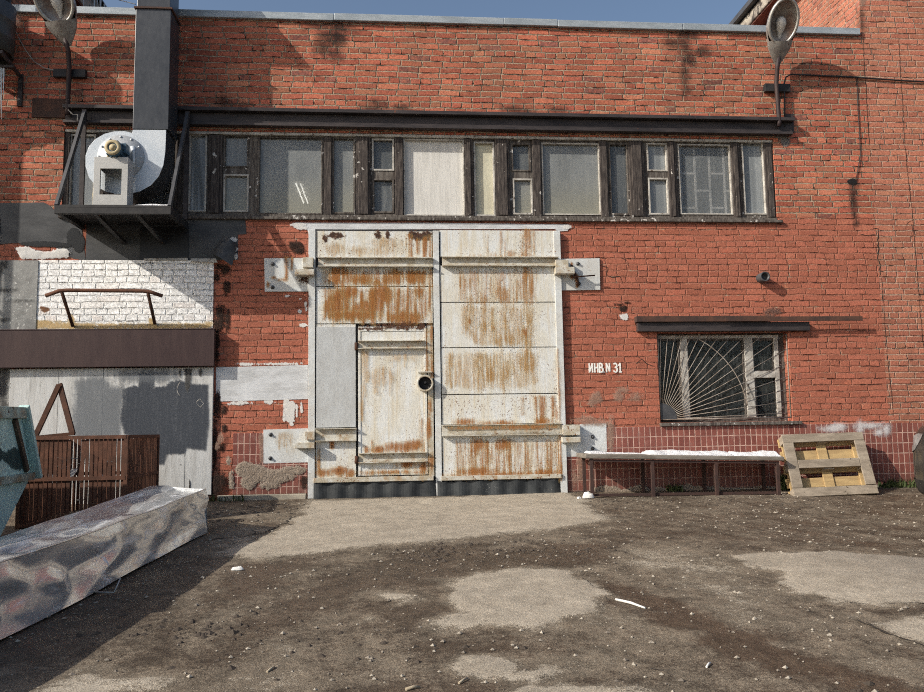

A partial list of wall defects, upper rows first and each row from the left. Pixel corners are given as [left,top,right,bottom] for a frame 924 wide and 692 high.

corrosion [322,231,346,253]
corrosion [408,230,433,257]
corrosion [495,229,534,256]
corrosion [324,267,433,375]
corrosion [460,267,535,380]
corrosion [364,399,434,475]
corrosion [442,370,562,481]
corrosion [315,441,354,478]
crack [850,602,923,645]